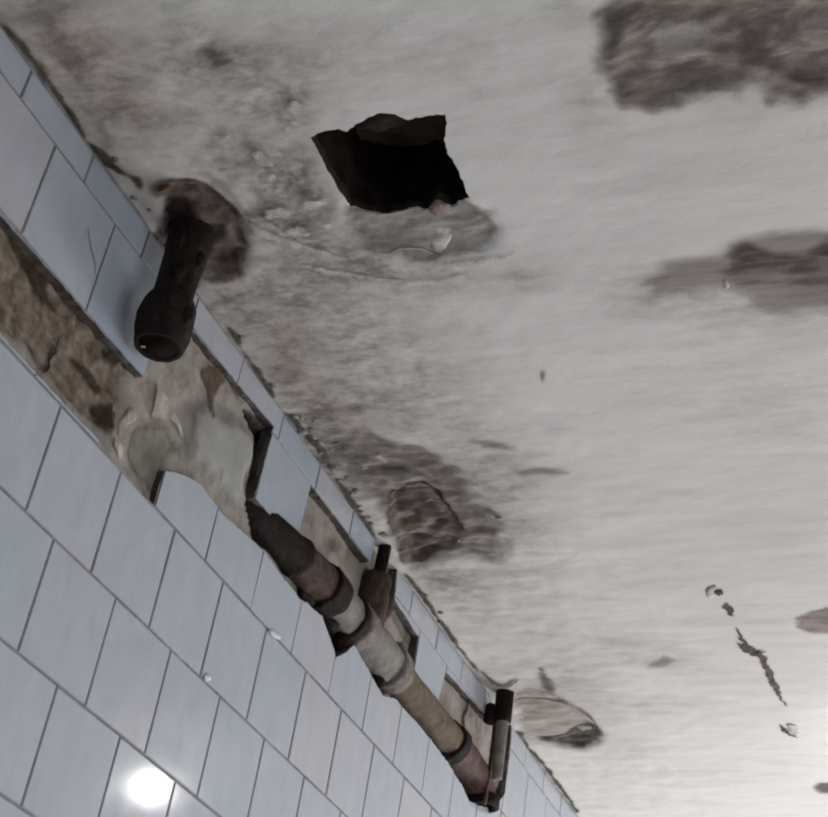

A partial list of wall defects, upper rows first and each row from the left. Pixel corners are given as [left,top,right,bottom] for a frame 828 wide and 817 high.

flaking render [253,150,330,207]
flaking render [311,135,510,279]
leakage [651,234,828,311]
flaking render [114,385,184,490]
flaking render [329,432,503,564]
flaking render [481,669,601,747]
crack [706,585,799,738]